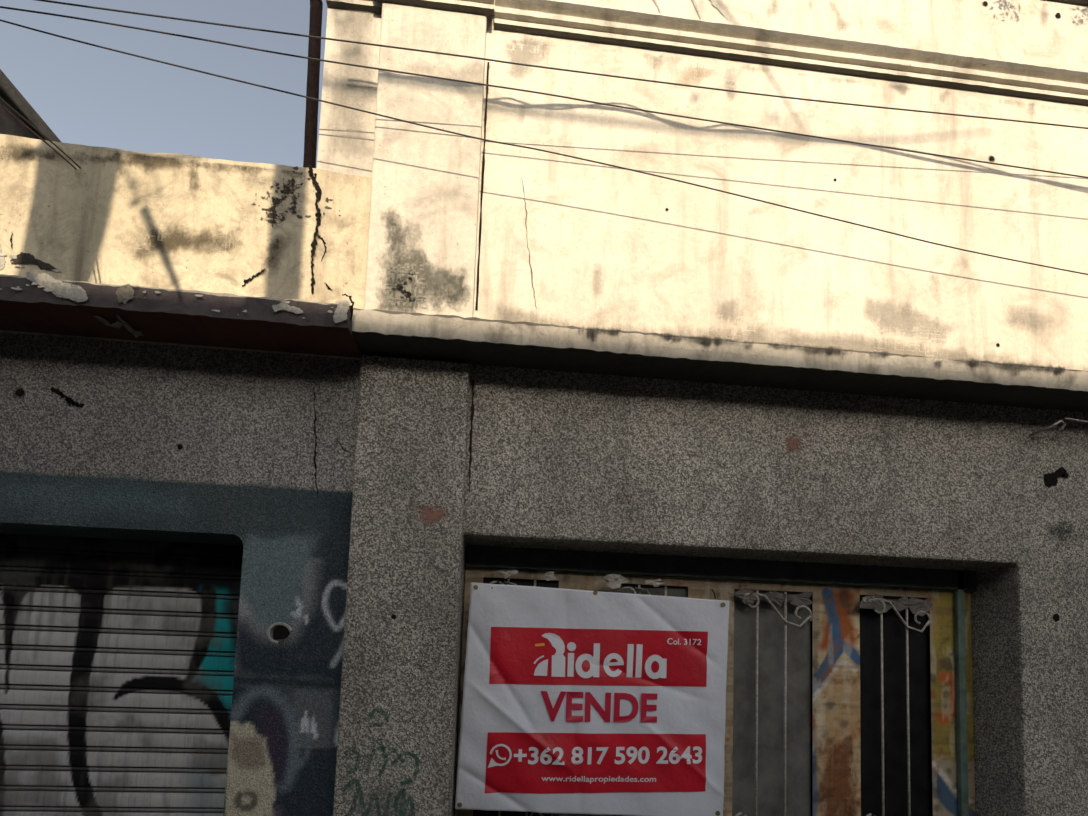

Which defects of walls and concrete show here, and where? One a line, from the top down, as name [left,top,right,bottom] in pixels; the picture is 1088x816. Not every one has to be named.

peeling [251,166,341,241]
peeling [0,247,88,302]
peeling [115,284,161,304]
peeling [272,300,350,323]
crack [308,164,354,321]
leakage [381,217,465,312]
crack [313,387,351,494]